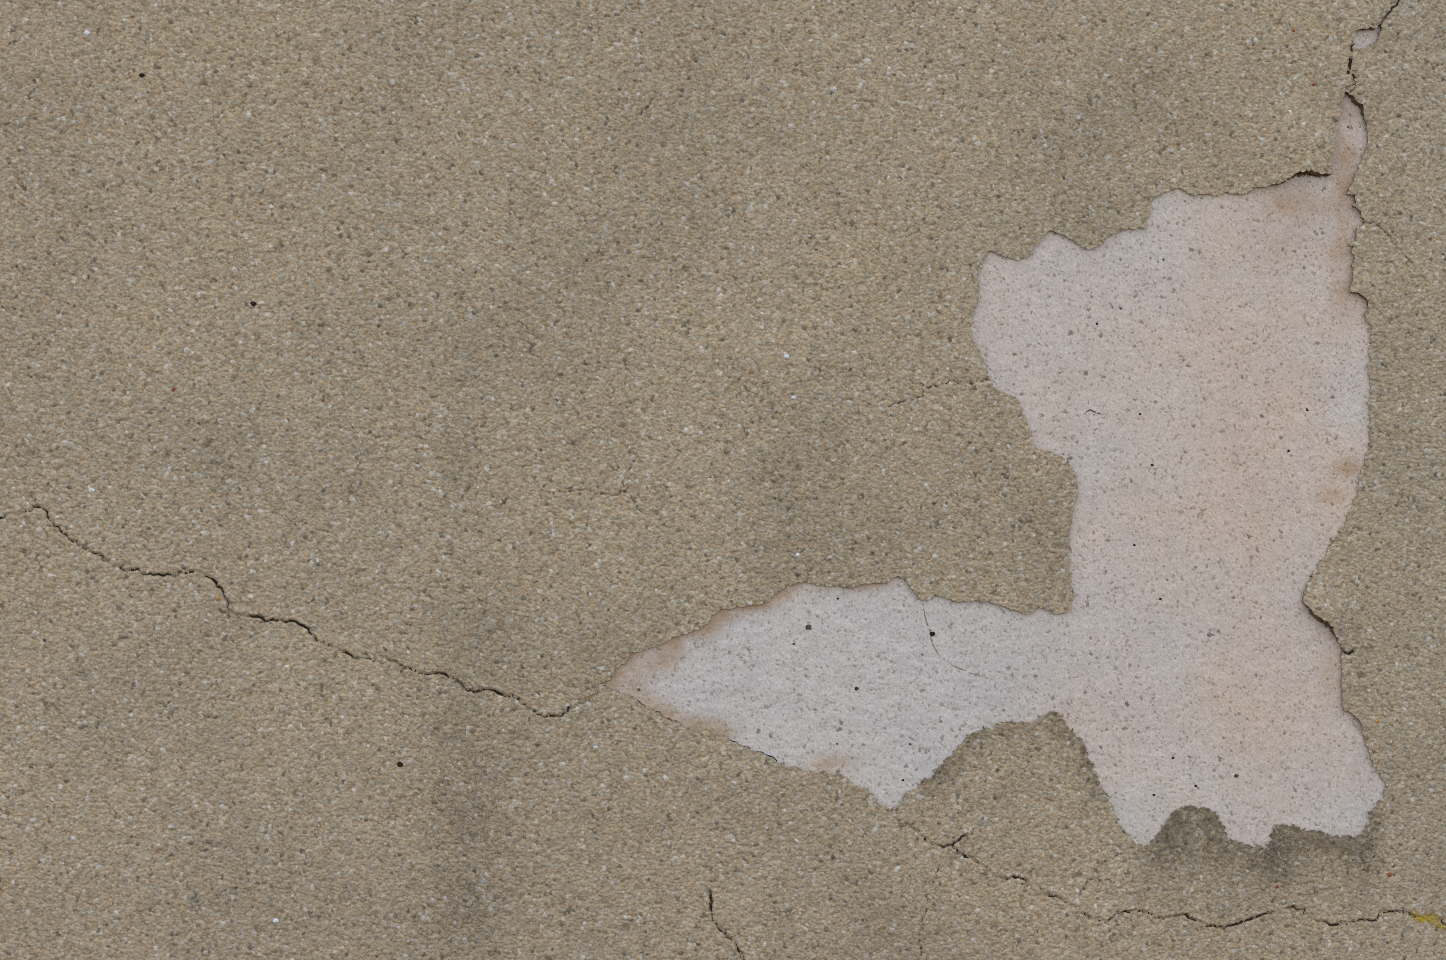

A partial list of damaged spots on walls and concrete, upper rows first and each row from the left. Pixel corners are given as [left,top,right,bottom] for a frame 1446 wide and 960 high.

crack [1347,0,1437,93]
peeling [603,25,1388,849]
crack [0,496,607,718]
crack [709,881,744,960]
crack [900,825,1444,956]